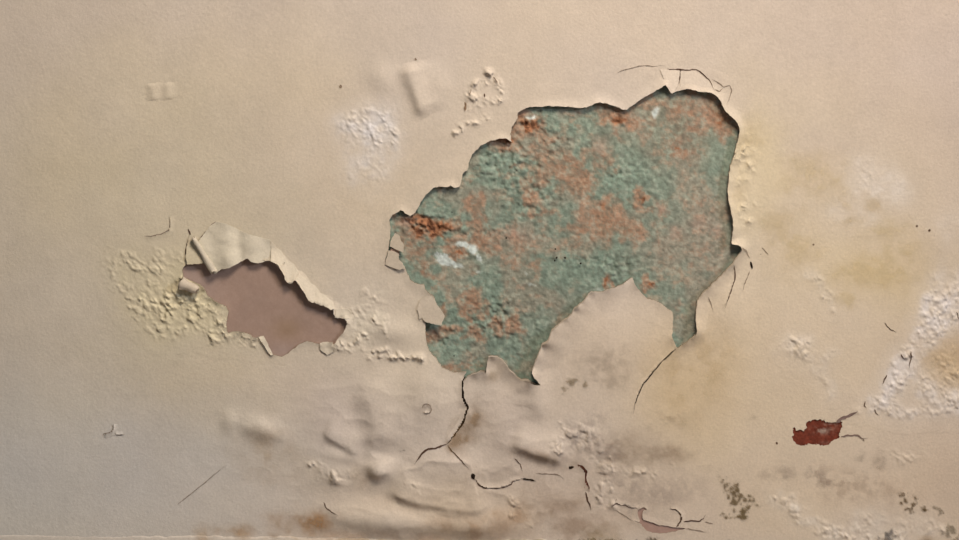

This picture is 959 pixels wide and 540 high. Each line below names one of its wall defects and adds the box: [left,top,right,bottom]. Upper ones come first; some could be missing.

crack [617,65,732,98]
leakage [322,90,417,209]
peeling [90,58,774,538]
leakage [767,144,959,434]
crack [629,346,676,412]
crack [416,374,641,520]
crack [671,504,712,532]
leakage [723,479,959,540]